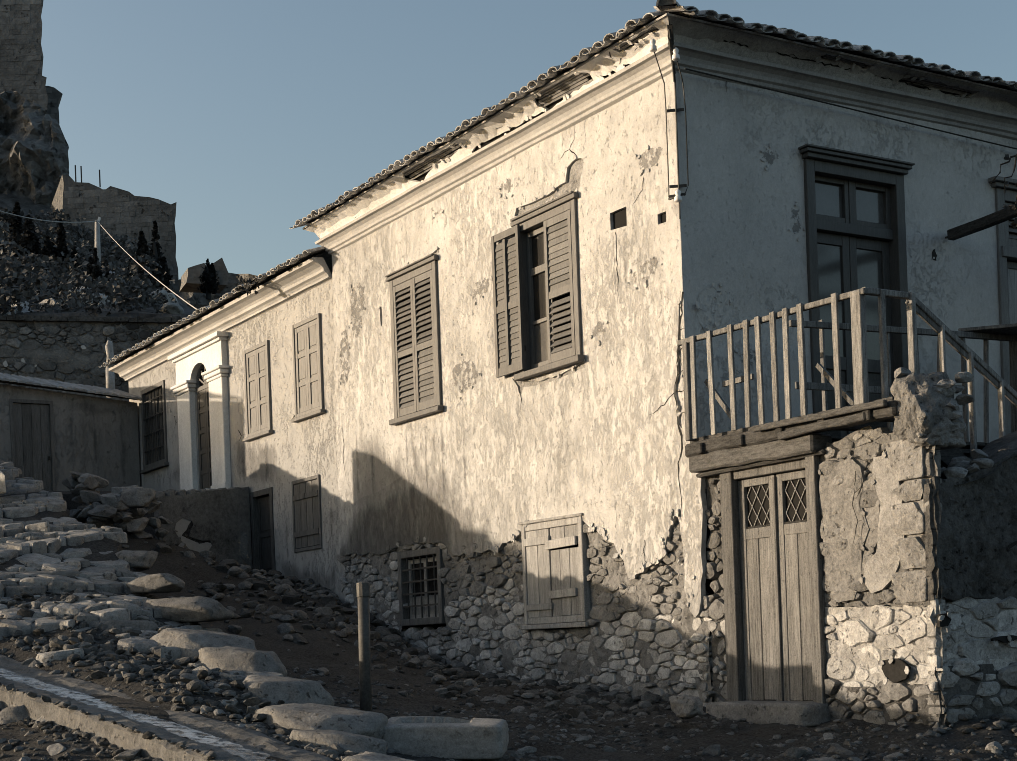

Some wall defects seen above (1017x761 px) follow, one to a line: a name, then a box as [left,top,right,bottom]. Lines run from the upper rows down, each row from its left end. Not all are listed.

spalling [474,92,552,152]
peeling [635,145,667,176]
crack [649,292,685,513]
spalling [336,509,716,707]